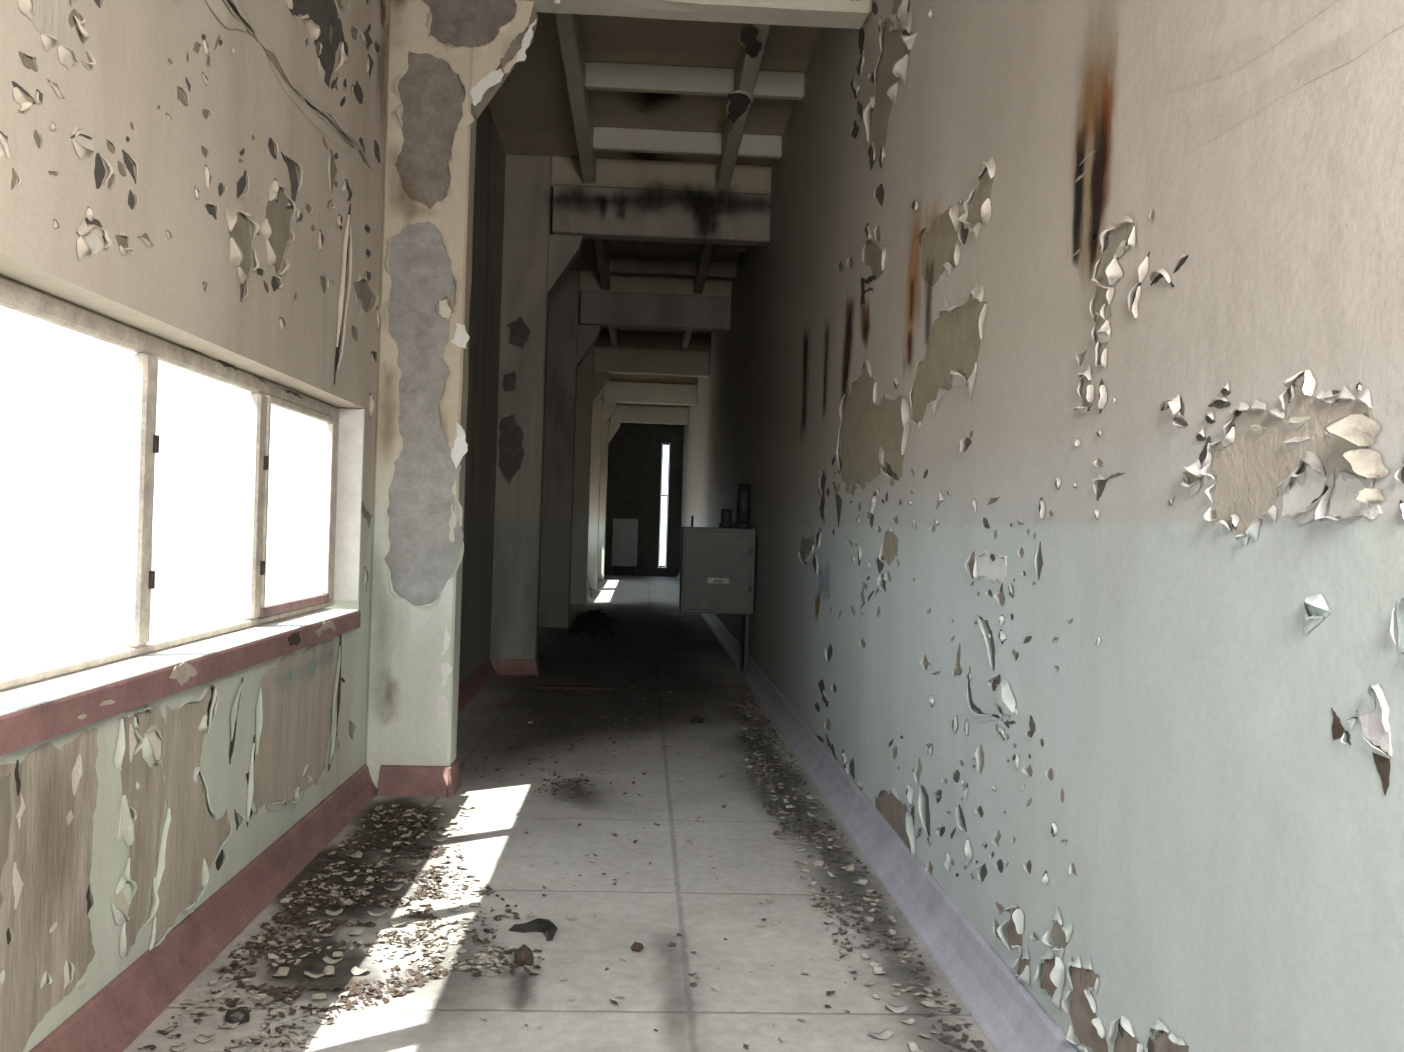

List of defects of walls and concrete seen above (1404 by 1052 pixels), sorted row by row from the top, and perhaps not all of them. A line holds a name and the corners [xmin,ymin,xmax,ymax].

peeling [285,0,385,107]
peeling [34,122,138,209]
peeling [194,135,345,302]
crack [206,0,373,385]
flaking render [351,0,536,614]
peeling [798,157,996,619]
corrosion [1072,61,1111,271]
peeling [1160,369,1382,546]
peeling [814,496,1064,885]
peeling [1331,683,1392,796]
peeling [0,662,232,1052]
peeling [993,902,1189,1052]